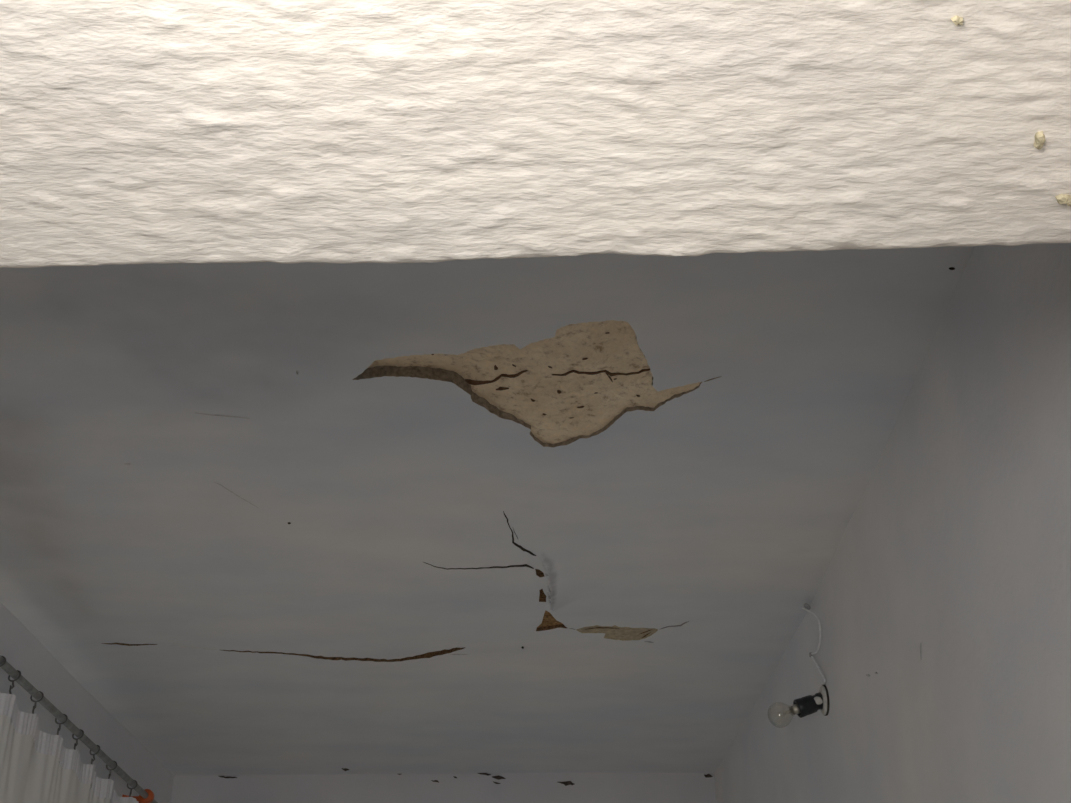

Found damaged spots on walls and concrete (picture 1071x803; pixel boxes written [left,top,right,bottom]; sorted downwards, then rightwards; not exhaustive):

flaking render [353,320,722,447]
crack [424,511,546,602]
crack [101,643,469,662]
flaking render [536,610,689,643]